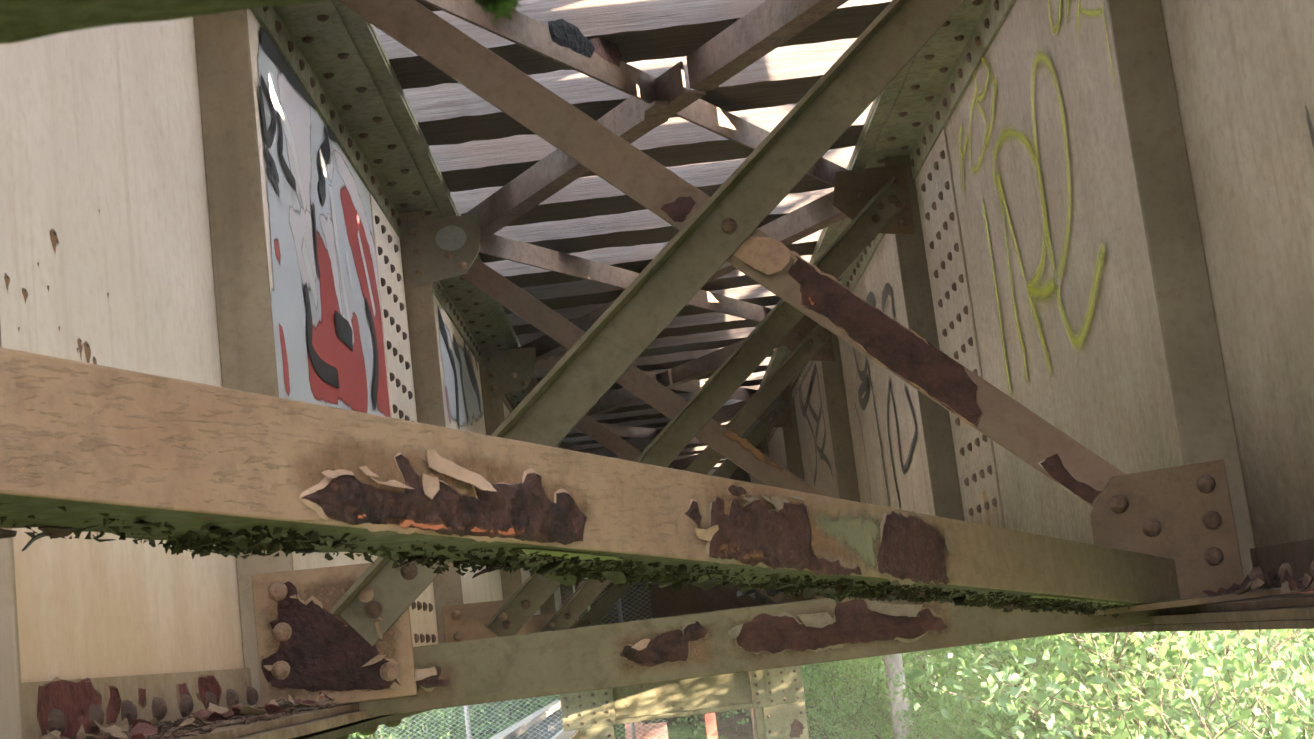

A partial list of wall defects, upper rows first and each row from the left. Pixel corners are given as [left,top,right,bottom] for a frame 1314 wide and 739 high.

corrosion [0,503,1135,619]
peeling [684,485,862,576]
peeling [876,510,954,586]
peeling [619,619,712,670]
peeling [728,599,948,656]
peeling [37,677,122,738]
peeling [138,688,146,708]
peeling [176,674,222,709]